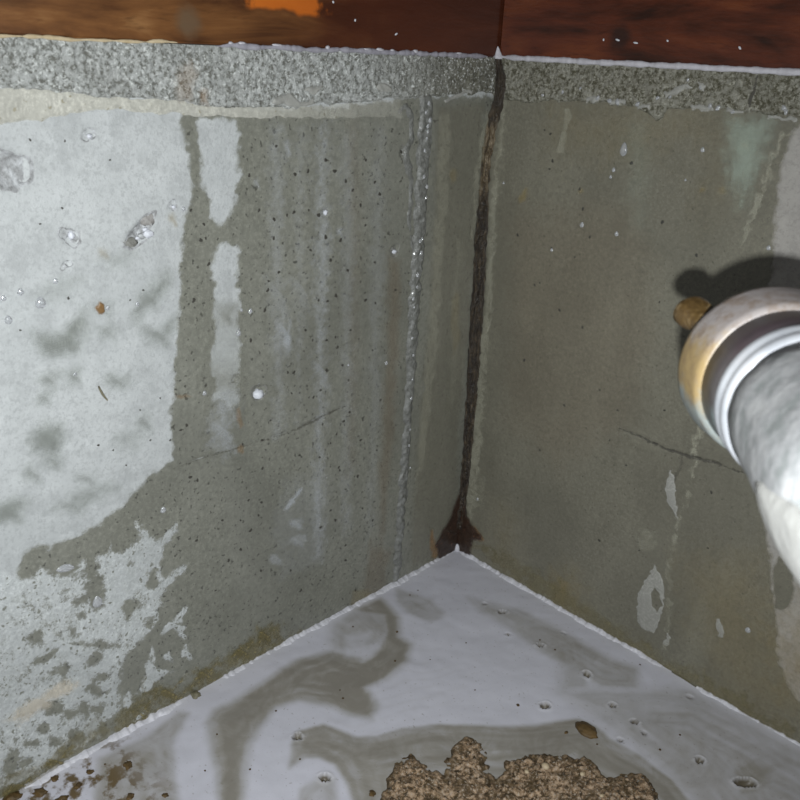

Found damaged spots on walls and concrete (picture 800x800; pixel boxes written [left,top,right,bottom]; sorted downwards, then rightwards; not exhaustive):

crack [456,59,507,530]
leakage [0,97,420,799]
leakage [399,89,800,743]
crack [619,428,744,473]
rust [430,494,484,559]
peeling [665,470,678,518]
peeling [636,565,665,633]